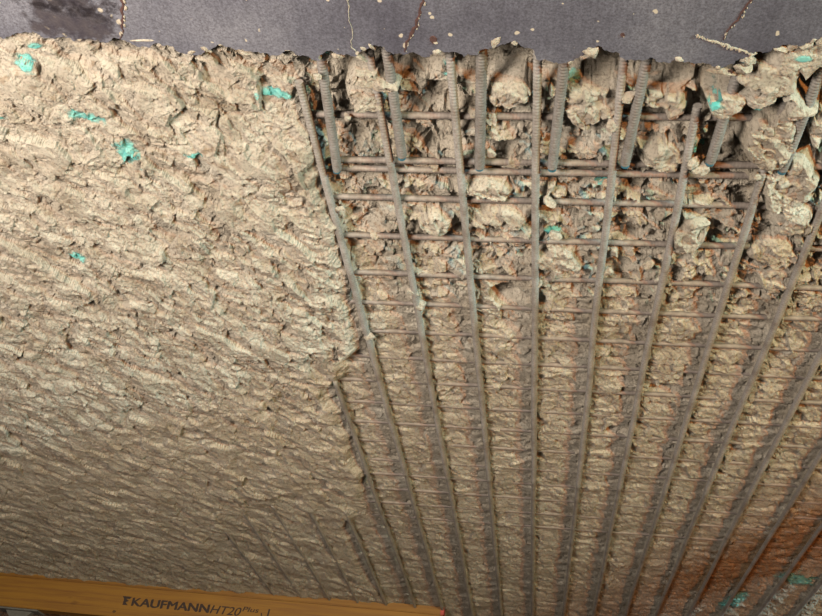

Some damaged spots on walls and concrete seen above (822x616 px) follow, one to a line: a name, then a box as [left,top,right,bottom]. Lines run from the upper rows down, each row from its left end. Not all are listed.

damp [31,0,114,41]
crack [119,0,128,39]
crack [347,0,356,51]
crack [404,0,426,52]
crack [695,0,753,55]
damp [15,43,41,72]
spalling [465,37,822,616]